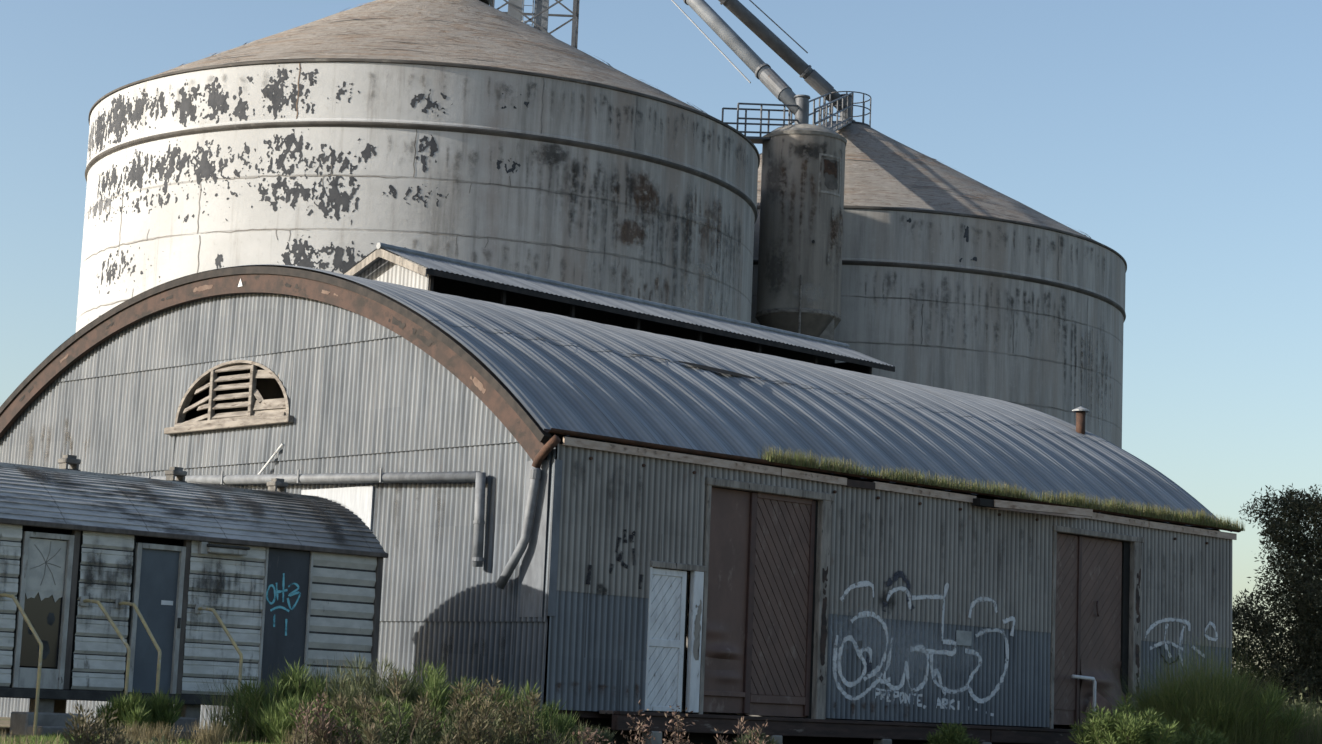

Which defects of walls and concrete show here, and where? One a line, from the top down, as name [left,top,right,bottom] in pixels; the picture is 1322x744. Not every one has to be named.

peeling [87,68,376,226]
peeling [97,246,160,294]
peeling [281,235,387,273]
peeling [470,377,486,394]